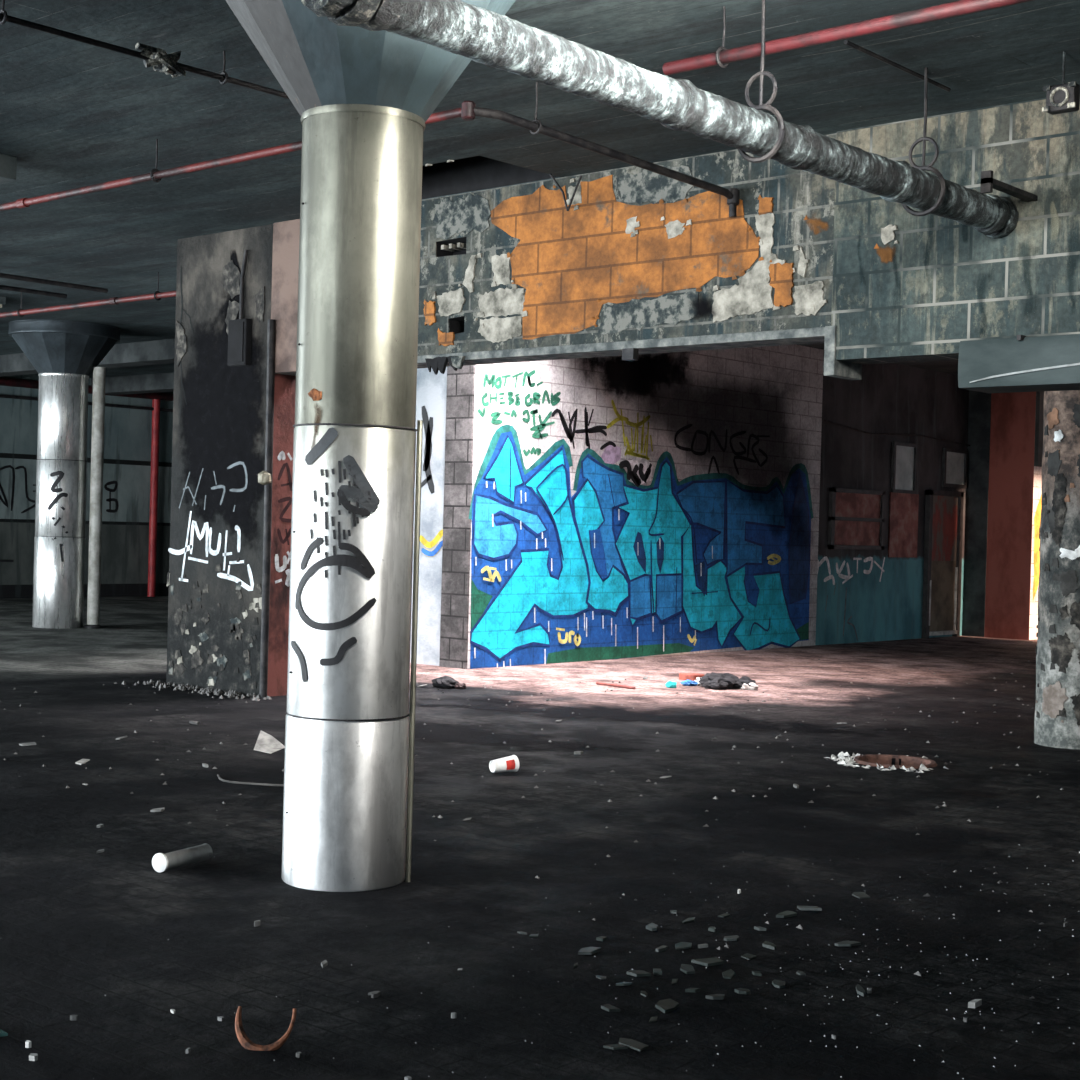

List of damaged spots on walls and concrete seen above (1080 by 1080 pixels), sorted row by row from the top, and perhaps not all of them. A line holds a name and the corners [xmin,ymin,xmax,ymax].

peeling [423,165,828,375]
spalling [874,225,899,263]
peeling [1034,449,1080,727]